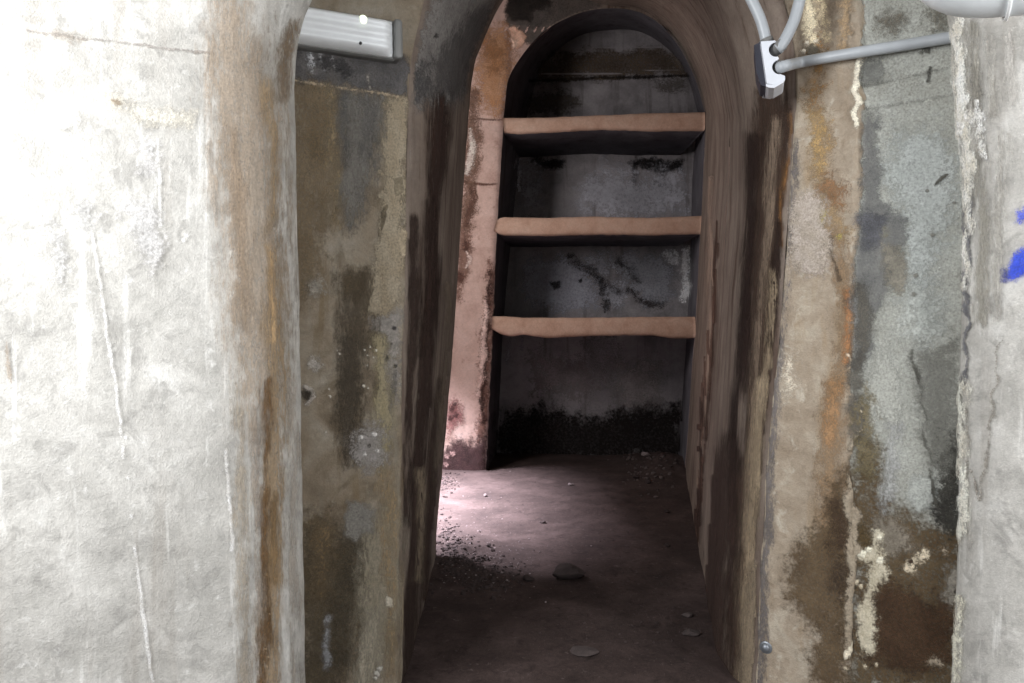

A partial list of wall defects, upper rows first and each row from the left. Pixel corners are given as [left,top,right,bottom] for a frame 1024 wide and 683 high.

leakage [204,0,692,683]
rust [474,21,516,119]
rust [813,233,857,538]
leakage [694,0,1018,683]
spalling [846,0,987,683]
crack [960,185,1003,501]